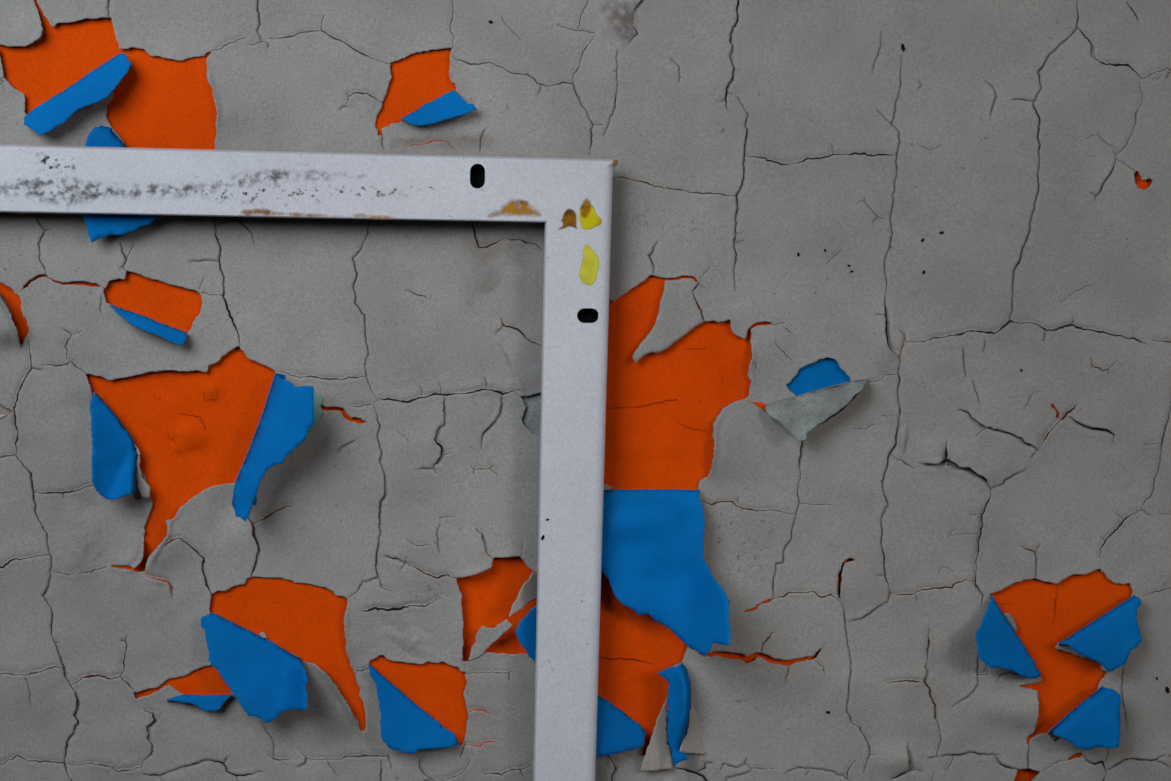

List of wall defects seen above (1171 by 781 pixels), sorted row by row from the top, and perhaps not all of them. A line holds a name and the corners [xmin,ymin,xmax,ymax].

peeling [0,0,217,150]
crack [212,0,391,64]
peeling [375,48,476,136]
crack [449,0,642,155]
crack [472,221,542,250]
peeling [86,346,323,572]
crack [273,220,520,612]
crack [496,318,539,345]
peeling [596,275,868,771]
crack [600,0,1171,781]
peeling [134,556,537,754]
peeling [975,569,1142,749]